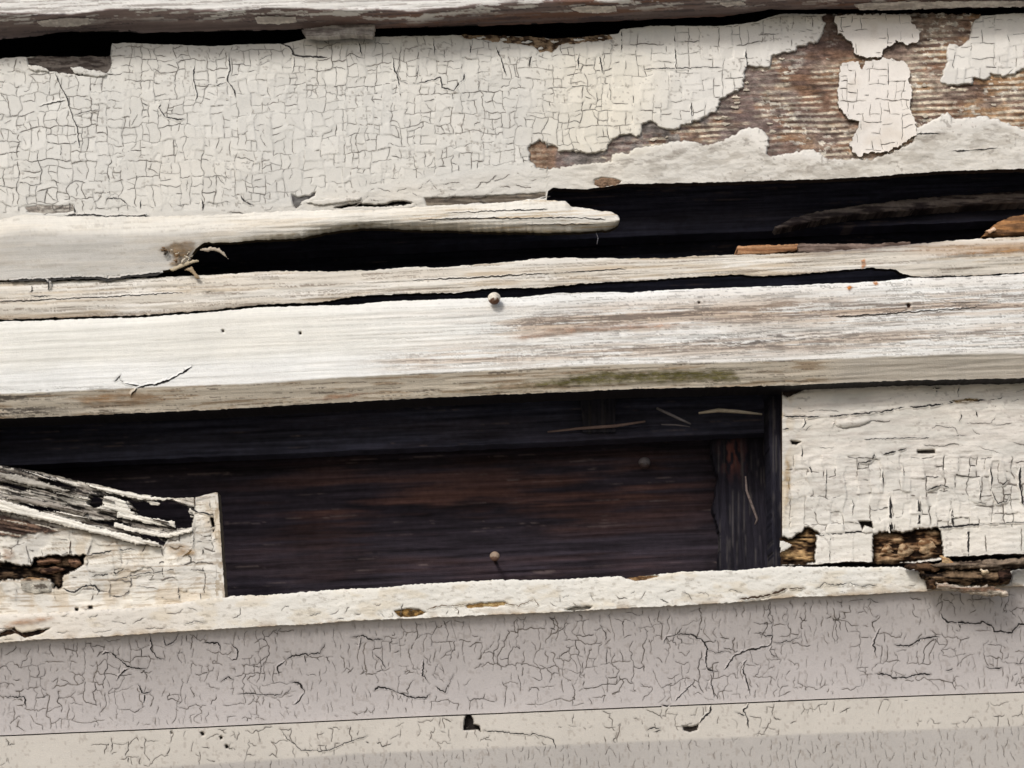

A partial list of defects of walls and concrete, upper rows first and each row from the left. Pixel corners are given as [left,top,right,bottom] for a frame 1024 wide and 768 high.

peeling [462,34,613,52]
crack [952,16,1022,79]
peeling [528,1,1024,169]
crack [0,16,817,225]
peeling [594,177,621,188]
crack [115,365,192,397]
crack [0,389,1024,768]